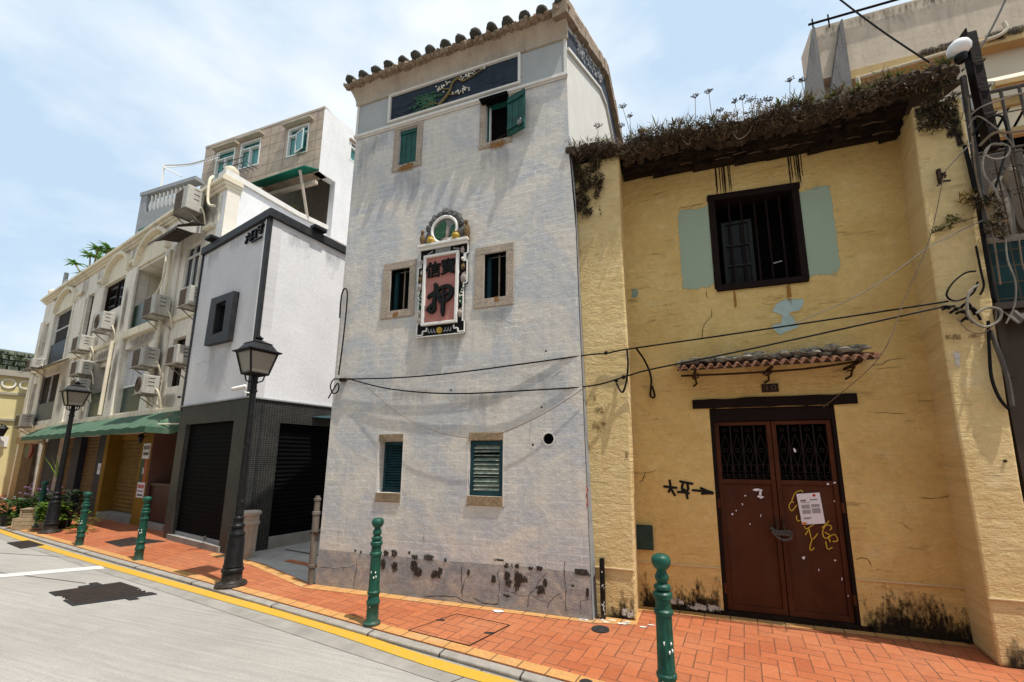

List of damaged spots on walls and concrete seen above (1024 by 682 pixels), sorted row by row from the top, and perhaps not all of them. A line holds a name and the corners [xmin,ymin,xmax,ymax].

leakage [380,550,447,579]
leakage [491,559,547,598]
mould [864,599,974,644]